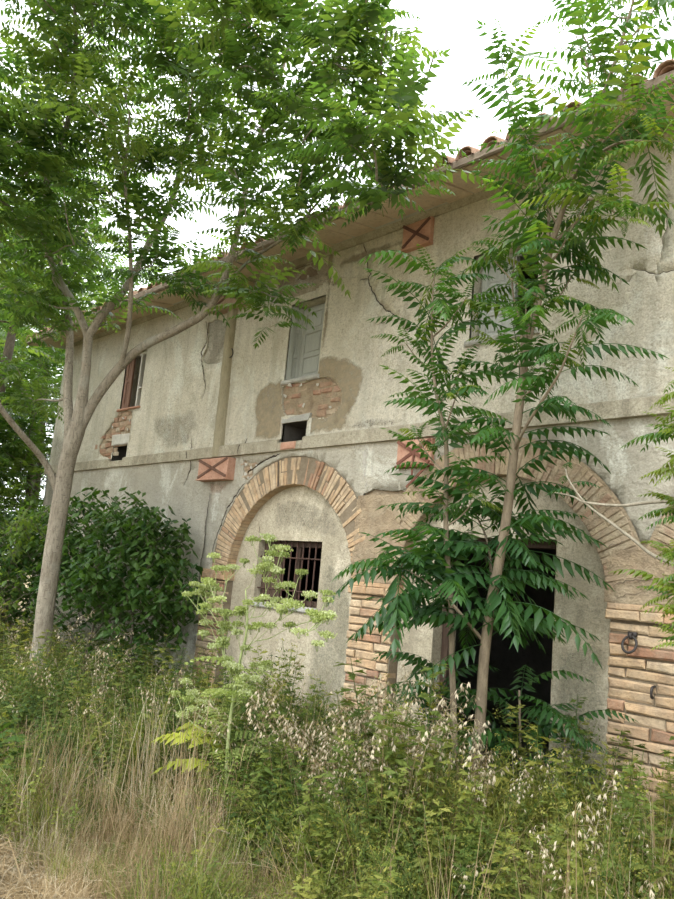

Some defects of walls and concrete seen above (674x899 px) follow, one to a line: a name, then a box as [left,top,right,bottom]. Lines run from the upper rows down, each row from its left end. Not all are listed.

crack [622,197,674,282]
spalling [283,377,342,418]
spalling [95,411,132,459]